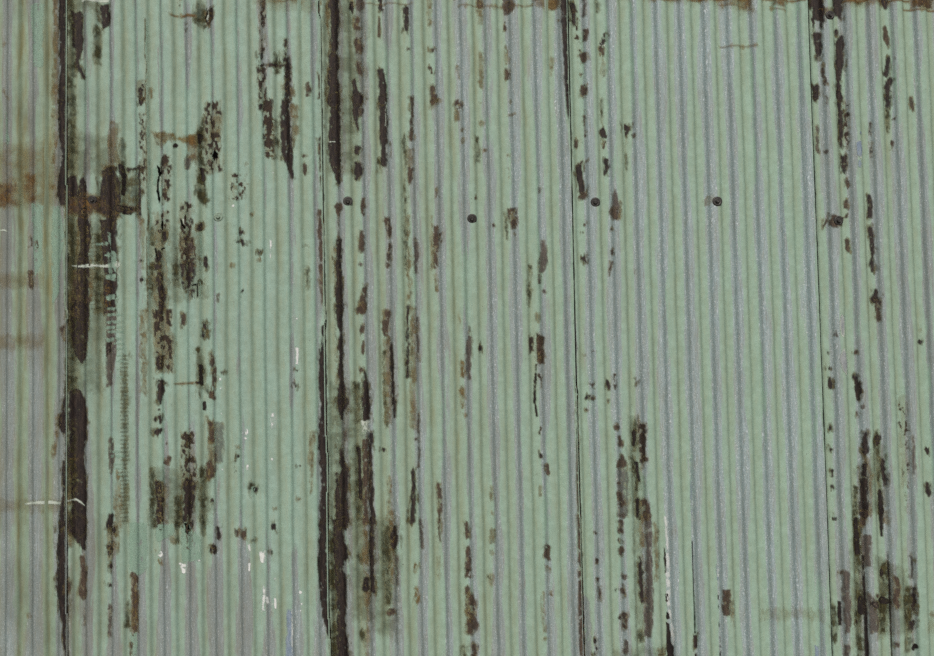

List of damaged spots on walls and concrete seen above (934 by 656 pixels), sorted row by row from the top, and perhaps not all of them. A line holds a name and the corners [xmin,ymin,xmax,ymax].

corrosion [502,0,515,31]
corrosion [535,0,598,116]
corrosion [256,0,307,179]
corrosion [377,67,391,166]
corrosion [770,0,934,228]
corrosion [402,96,414,203]
corrosion [599,127,610,175]
corrosion [573,161,587,200]
corrosion [492,208,518,236]
corrosion [609,191,621,230]
corrosion [404,231,419,276]
corrosion [538,240,548,293]